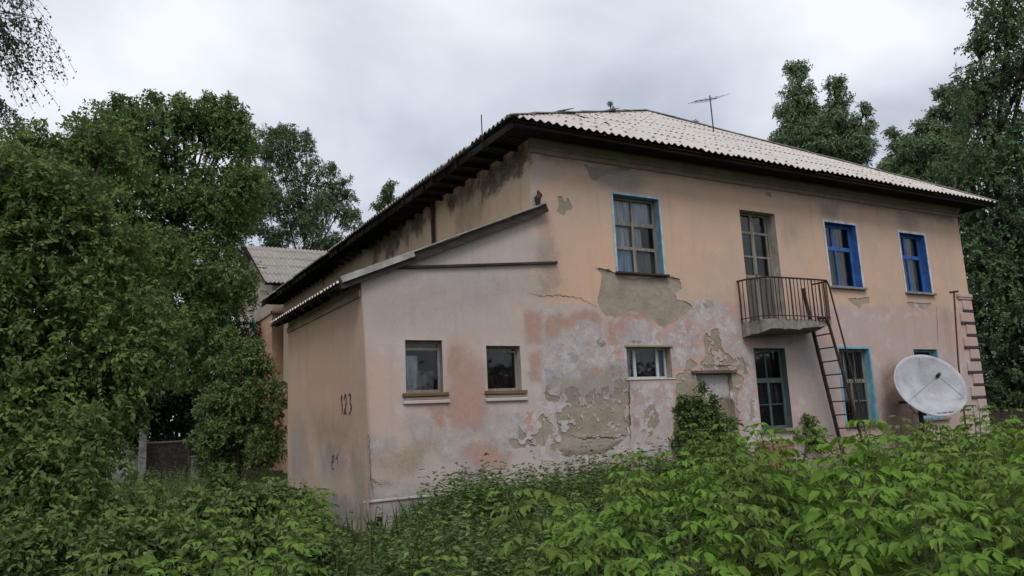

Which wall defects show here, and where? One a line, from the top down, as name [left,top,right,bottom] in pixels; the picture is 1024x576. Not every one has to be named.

flaking render [557,196,572,215]
water stain [316,139,955,342]
flaking render [496,268,795,471]